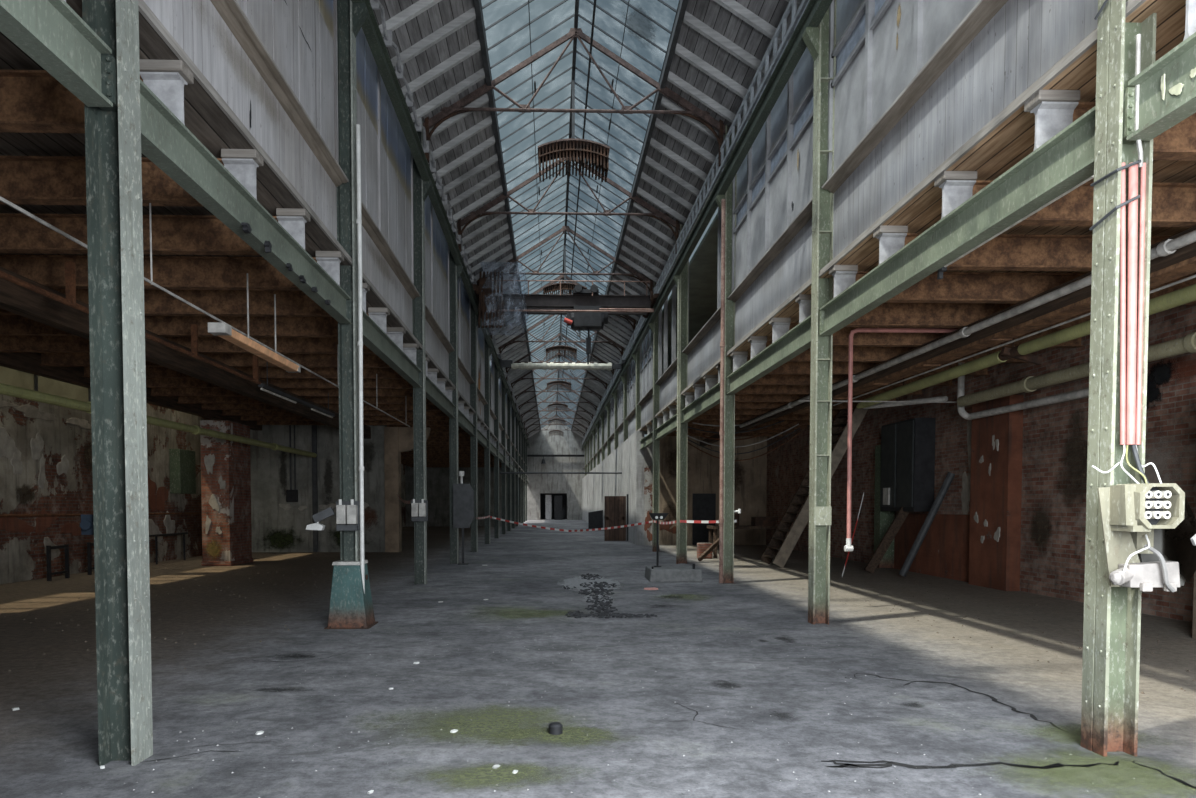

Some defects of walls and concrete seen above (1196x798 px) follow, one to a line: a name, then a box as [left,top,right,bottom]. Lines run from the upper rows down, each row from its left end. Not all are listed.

flaking render [0,400,91,490]
flaking render [147,461,175,542]
flaking render [204,429,226,535]
crack [845,673,1069,733]